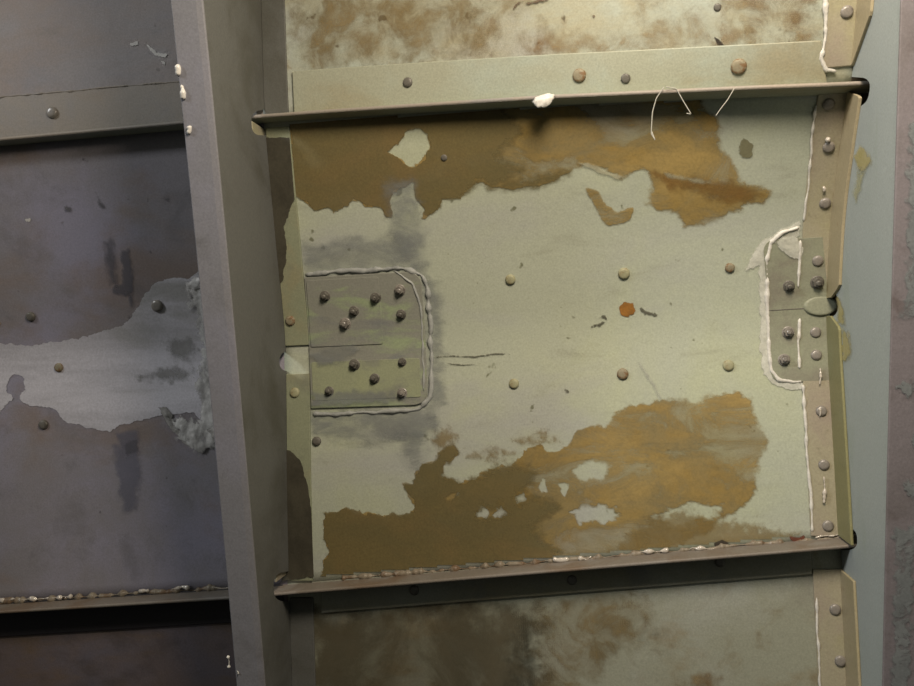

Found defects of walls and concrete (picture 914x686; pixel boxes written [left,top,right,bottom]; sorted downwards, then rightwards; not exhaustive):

corrosion [619,302,635,317]
peeling [0,272,205,432]
leakage [314,607,409,686]
leakage [422,603,572,686]